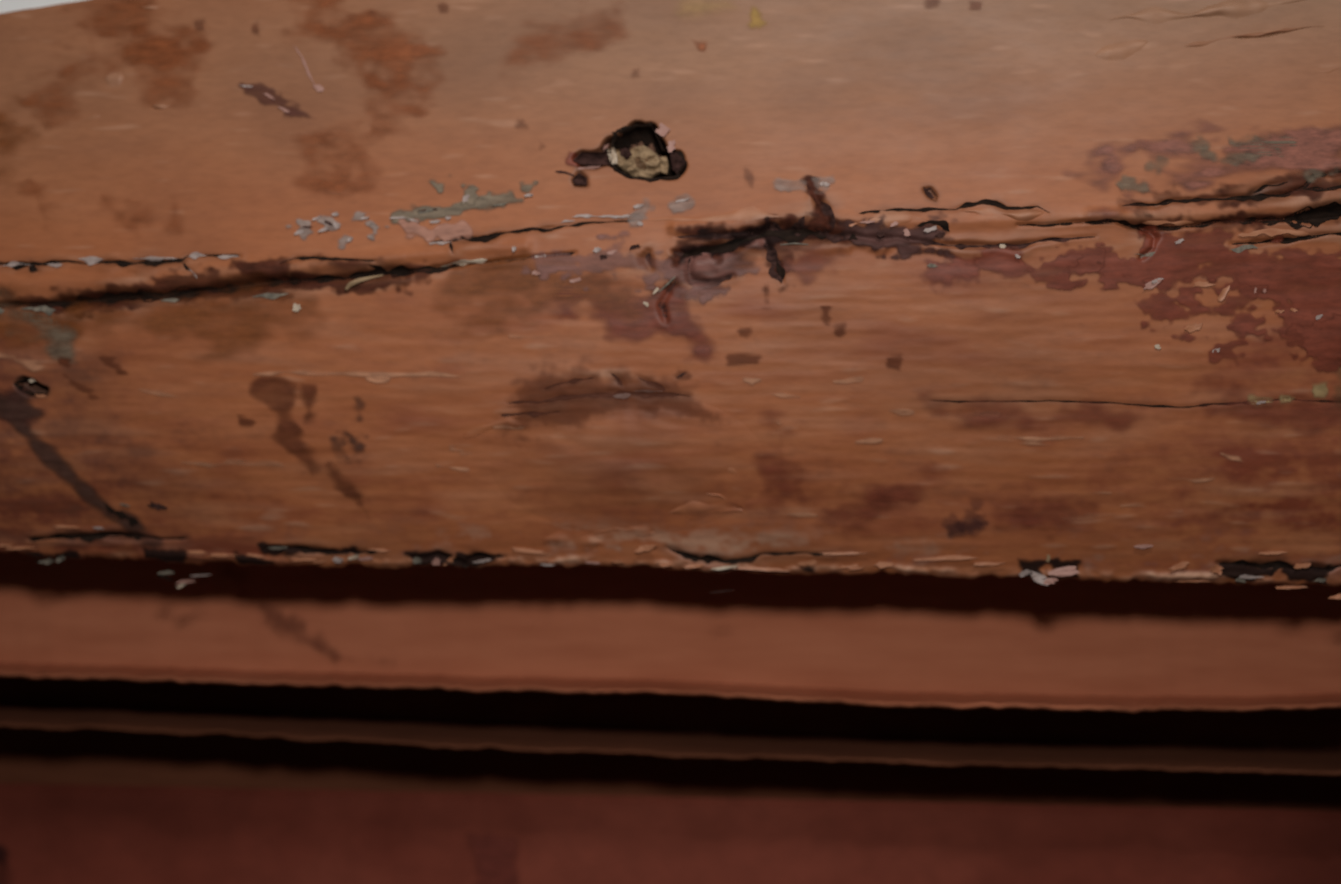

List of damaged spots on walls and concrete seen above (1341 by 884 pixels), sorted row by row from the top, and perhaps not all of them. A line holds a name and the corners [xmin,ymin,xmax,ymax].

spalling [555,144,609,186]
peeling [655,123,676,152]
crack [0,214,630,318]
peeling [286,180,537,249]
crack [645,169,1341,318]
peeling [999,225,1341,397]
leakage [252,378,316,464]
leakage [0,393,159,547]
peeling [144,542,496,589]
peeling [585,544,894,573]
peeling [1019,555,1081,586]
peeling [1169,551,1341,599]